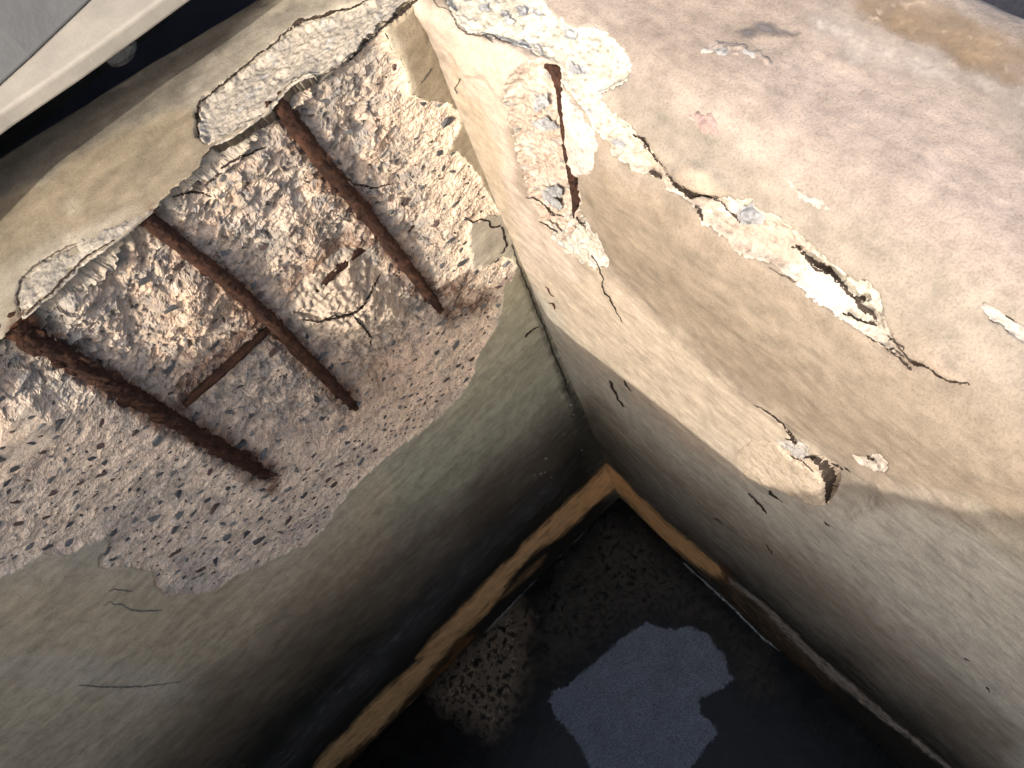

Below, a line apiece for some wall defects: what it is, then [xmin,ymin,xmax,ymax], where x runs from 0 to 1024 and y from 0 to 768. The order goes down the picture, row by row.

spalling [447,0,900,356]
spalling [0,0,516,596]
flaking render [980,302,1024,342]
crack [754,405,797,444]
flaking render [851,453,888,472]